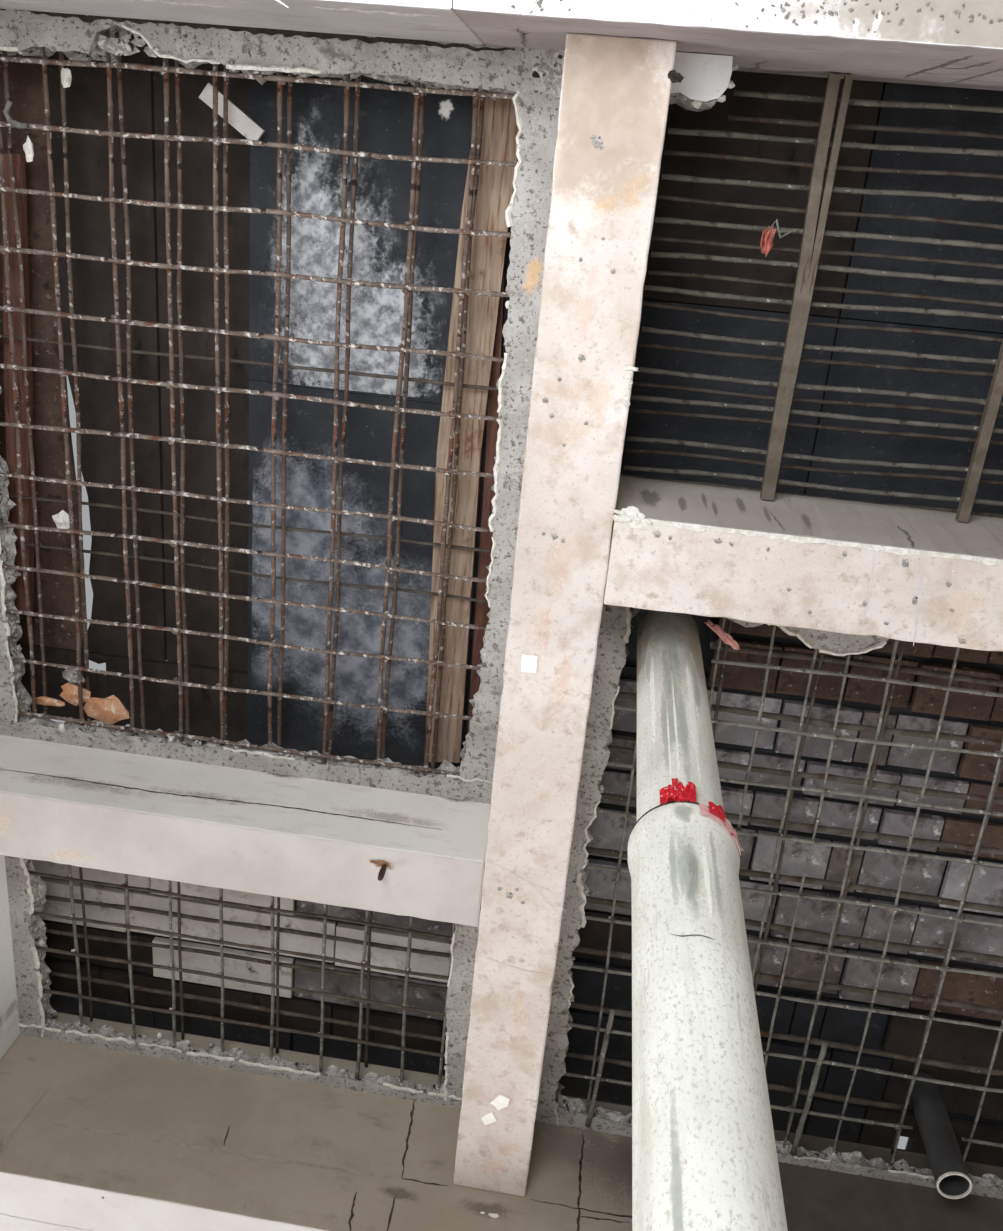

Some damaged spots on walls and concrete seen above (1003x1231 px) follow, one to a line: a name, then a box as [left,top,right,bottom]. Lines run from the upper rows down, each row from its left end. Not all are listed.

spalling [668,52,1003,157]
spalling [662,174,1003,203]
spalling [664,150,1003,179]
spalling [643,195,1003,343]
spalling [621,366,778,424]
spalling [639,326,785,361]
spalling [787,383,1003,445]
spalling [800,344,997,377]
spalling [622,436,1003,518]
spalling [535,602,641,1137]
spalling [709,617,1003,1199]
spalling [5,856,479,1109]